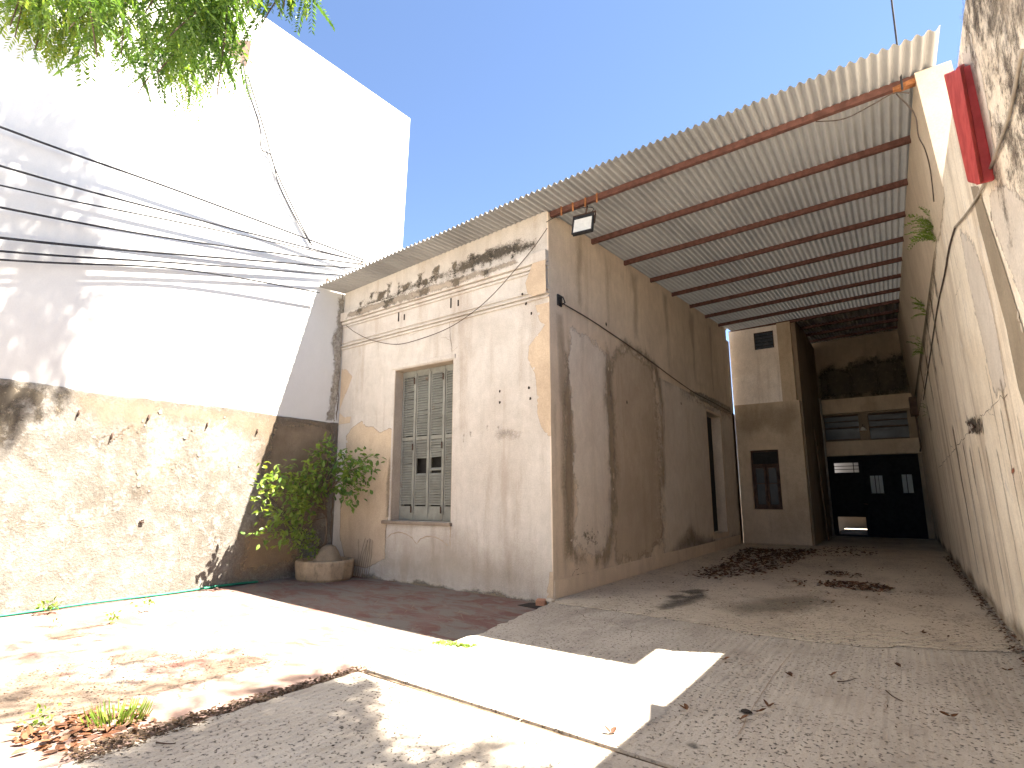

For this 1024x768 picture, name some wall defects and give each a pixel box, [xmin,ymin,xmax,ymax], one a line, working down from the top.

leakage [962,0,1024,220]
peeling [327,298,393,568]
leakage [348,238,535,317]
peeling [521,260,551,436]
leakage [564,360,615,563]